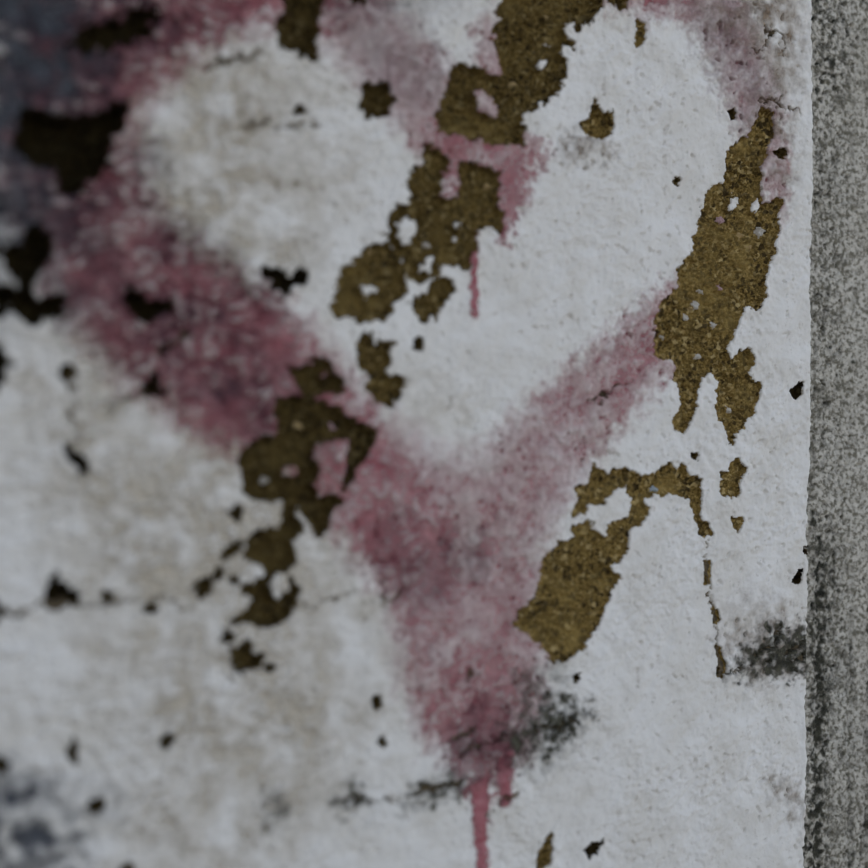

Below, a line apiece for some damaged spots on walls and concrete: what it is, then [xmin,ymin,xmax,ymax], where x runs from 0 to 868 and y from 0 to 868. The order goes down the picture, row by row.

peeling [10,97,130,197]
peeling [274,0,324,63]
spalling [358,79,397,120]
peeling [433,0,628,148]
peeling [0,223,68,327]
peeling [329,140,505,408]
peeling [652,107,788,446]
peeling [190,357,378,679]
peeling [512,452,713,664]
crack [703,561,718,621]
spalling [719,458,747,499]
crack [714,630,806,678]